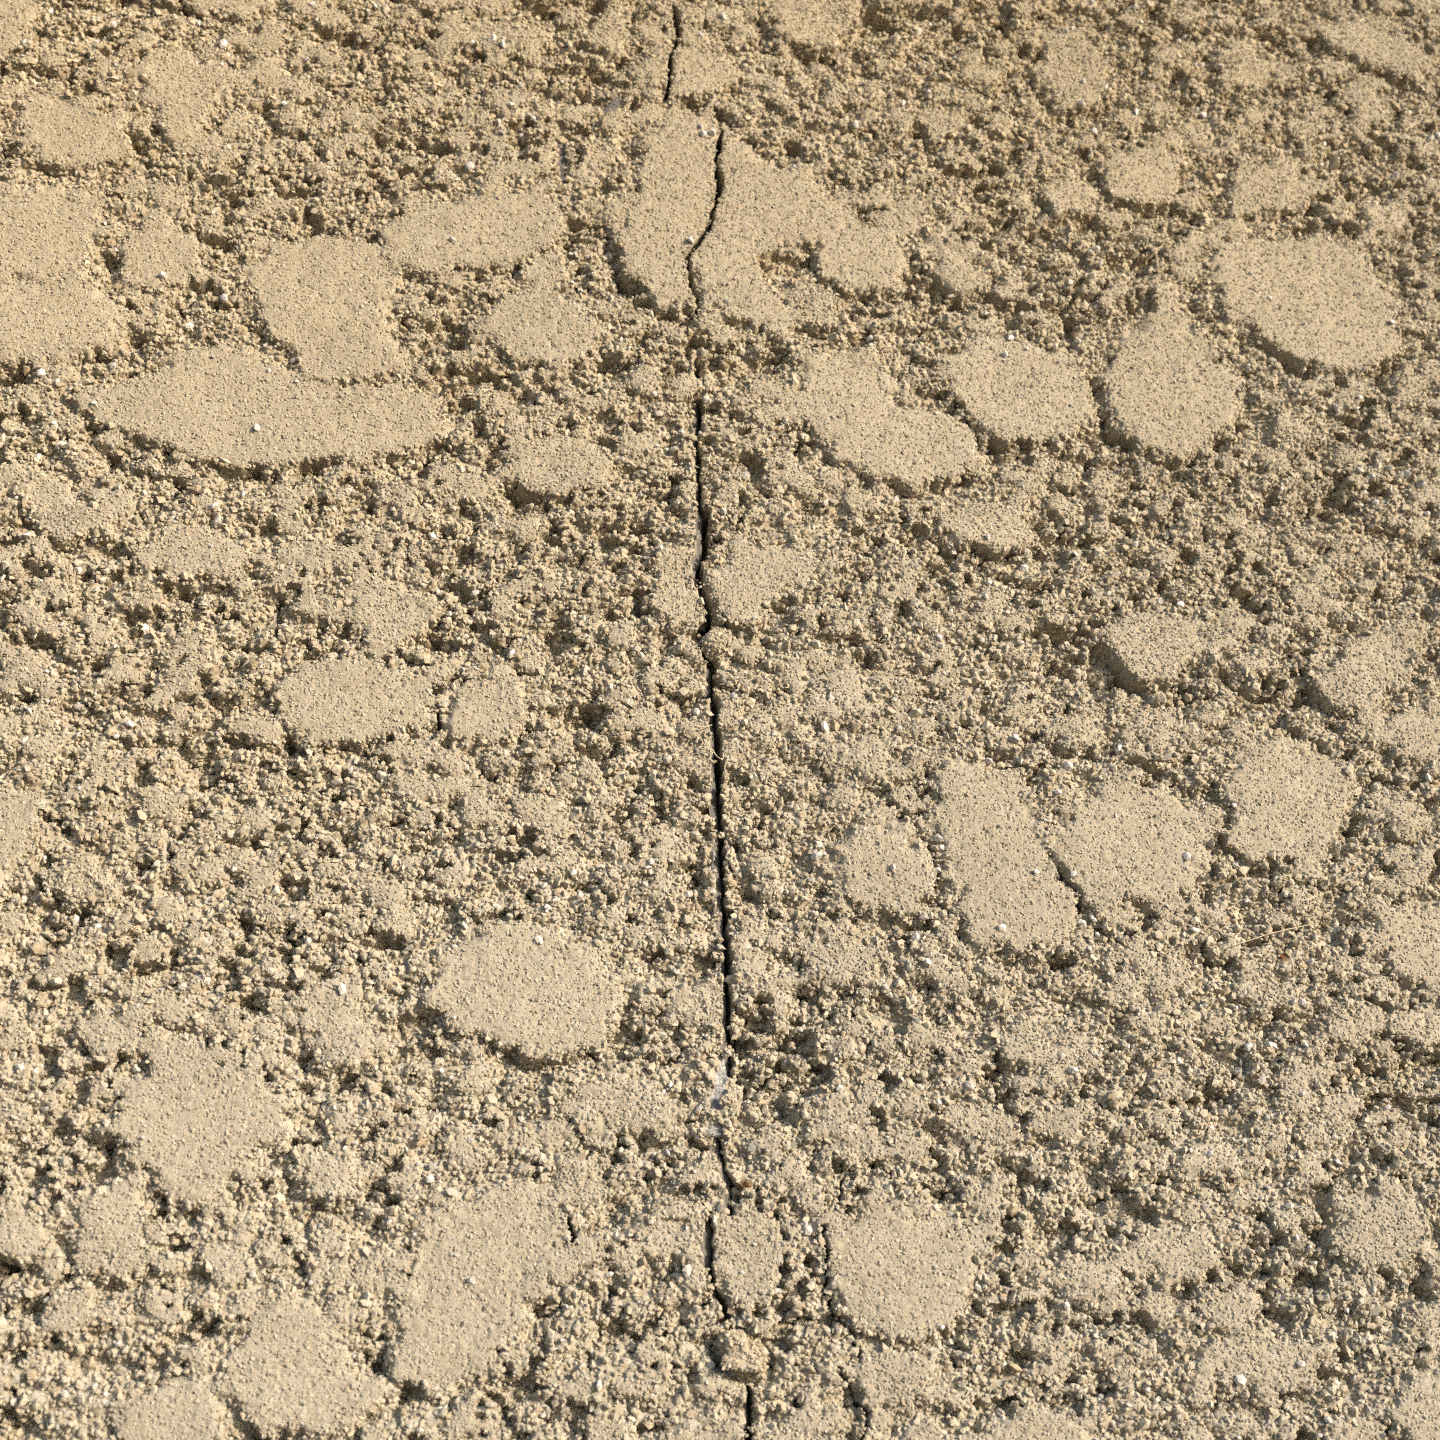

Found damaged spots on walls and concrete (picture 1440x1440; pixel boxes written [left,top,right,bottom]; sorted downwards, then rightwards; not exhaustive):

crack [690,405,737,1078]
crack [700,1138,738,1329]
crack [740,1397,748,1440]